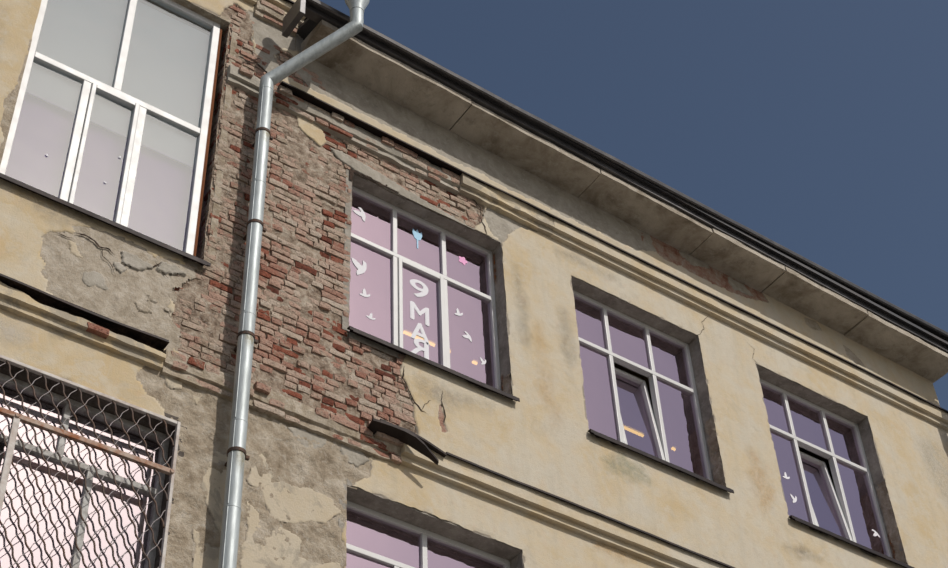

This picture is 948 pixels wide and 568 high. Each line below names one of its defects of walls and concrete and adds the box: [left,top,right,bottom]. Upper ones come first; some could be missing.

crack [55,232,114,272]
flaking render [0,4,304,568]
flaking render [251,105,536,435]
flaking render [276,60,768,303]
flaking render [236,408,371,568]
crack [402,370,446,422]
flaking render [705,416,726,487]